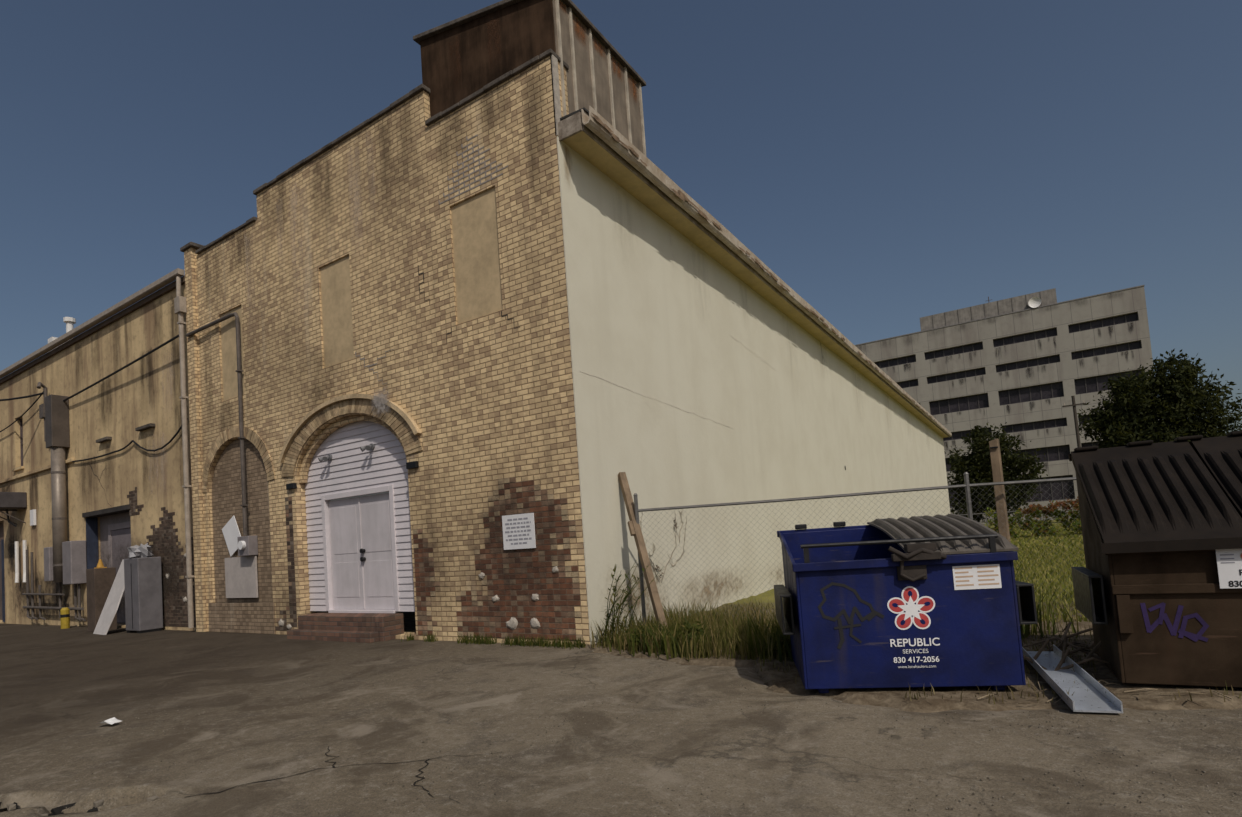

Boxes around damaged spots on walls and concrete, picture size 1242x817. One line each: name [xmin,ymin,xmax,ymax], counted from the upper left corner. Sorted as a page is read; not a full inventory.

water stain [171,298,179,388]
spalling [127,487,144,516]
spalling [146,507,196,627]
spalling [413,529,440,636]
spalling [456,477,583,641]
crack [187,746,499,803]